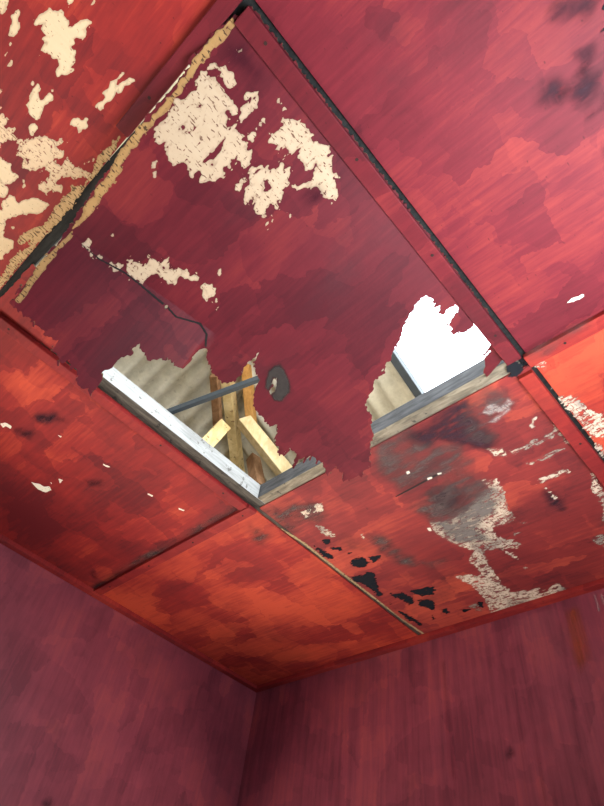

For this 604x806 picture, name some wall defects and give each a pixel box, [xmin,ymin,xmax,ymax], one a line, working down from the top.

peeling [0,0,20,67]
peeling [34,0,92,77]
peeling [95,72,135,111]
damp [573,76,596,101]
peeling [0,81,95,260]
peeling [154,62,340,230]
peeling [82,238,218,310]
peeling [487,425,569,465]
peeling [539,469,571,499]
peeling [591,473,604,521]
peeling [427,478,566,612]
damp [314,537,450,626]